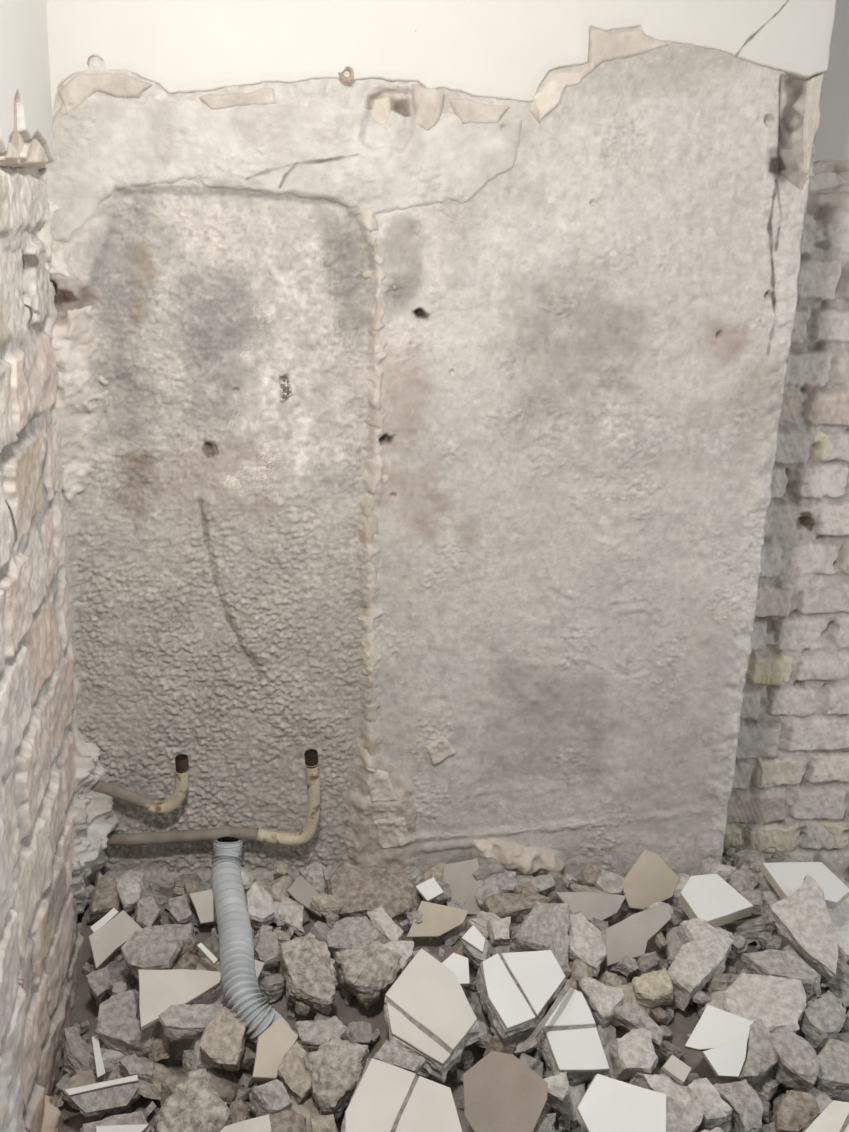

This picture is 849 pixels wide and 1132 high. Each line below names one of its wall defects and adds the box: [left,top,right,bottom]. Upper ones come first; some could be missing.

flaking render [0,30,669,243]
flaking render [778,73,849,195]
spalling [747,651,793,686]
flaking render [342,742,418,873]
spalling [756,757,797,786]
spalling [407,858,482,938]
spalling [723,821,849,910]
spalling [442,953,470,986]